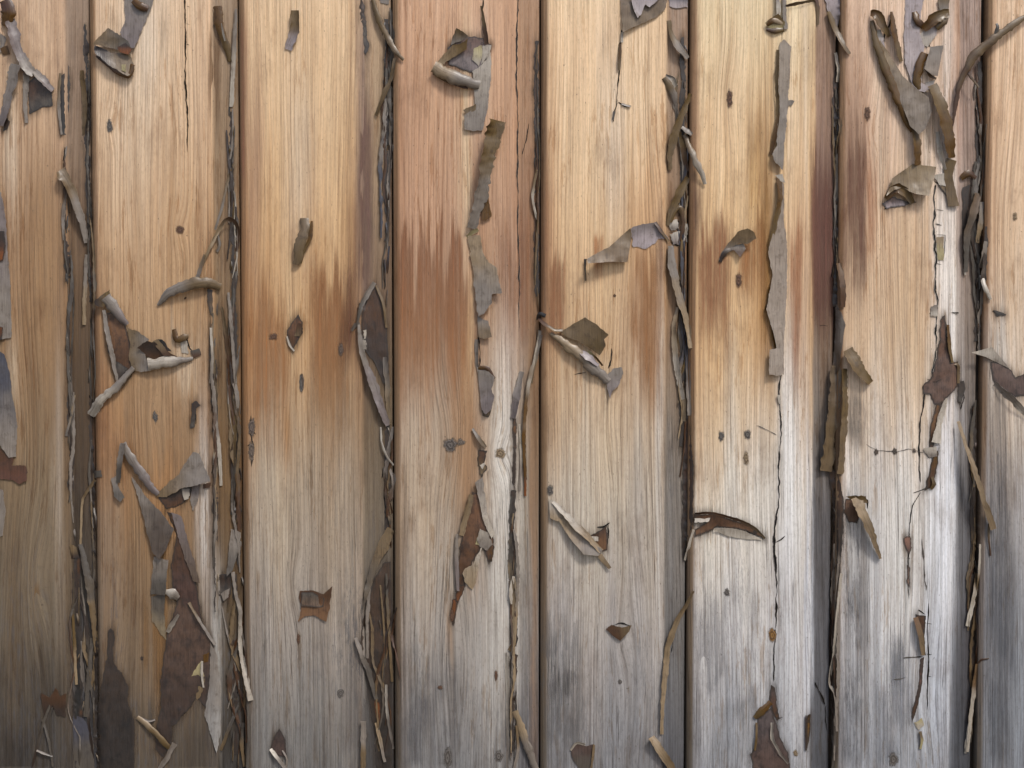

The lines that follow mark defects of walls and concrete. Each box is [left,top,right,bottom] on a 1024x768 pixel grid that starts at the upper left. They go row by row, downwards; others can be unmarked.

peeling [0,0,87,135]
peeling [32,164,255,768]
crack [182,0,190,148]
peeling [431,0,506,417]
peeling [444,428,495,626]
peeling [510,312,623,496]
peeling [584,74,765,561]
crack [759,375,785,680]
peeling [765,0,851,376]
peeling [914,315,965,493]
peeling [870,0,1024,316]
peeling [750,685,790,768]